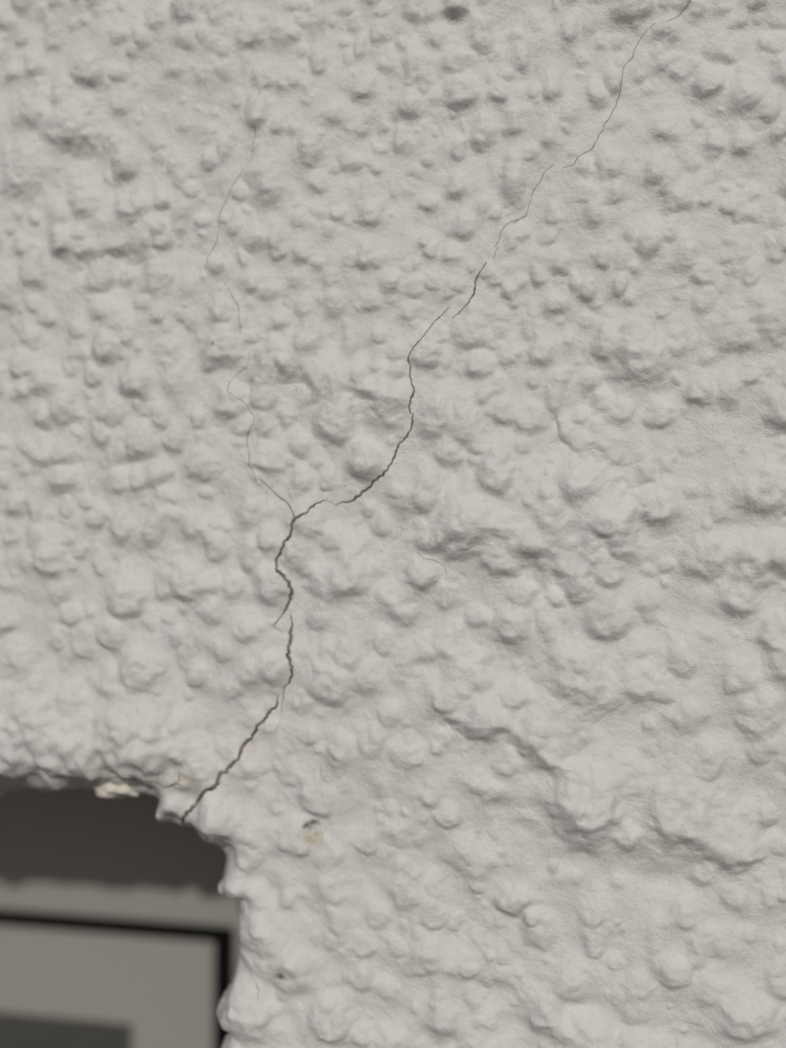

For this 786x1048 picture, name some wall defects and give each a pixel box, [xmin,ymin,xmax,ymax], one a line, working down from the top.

crack [108,0,691,825]